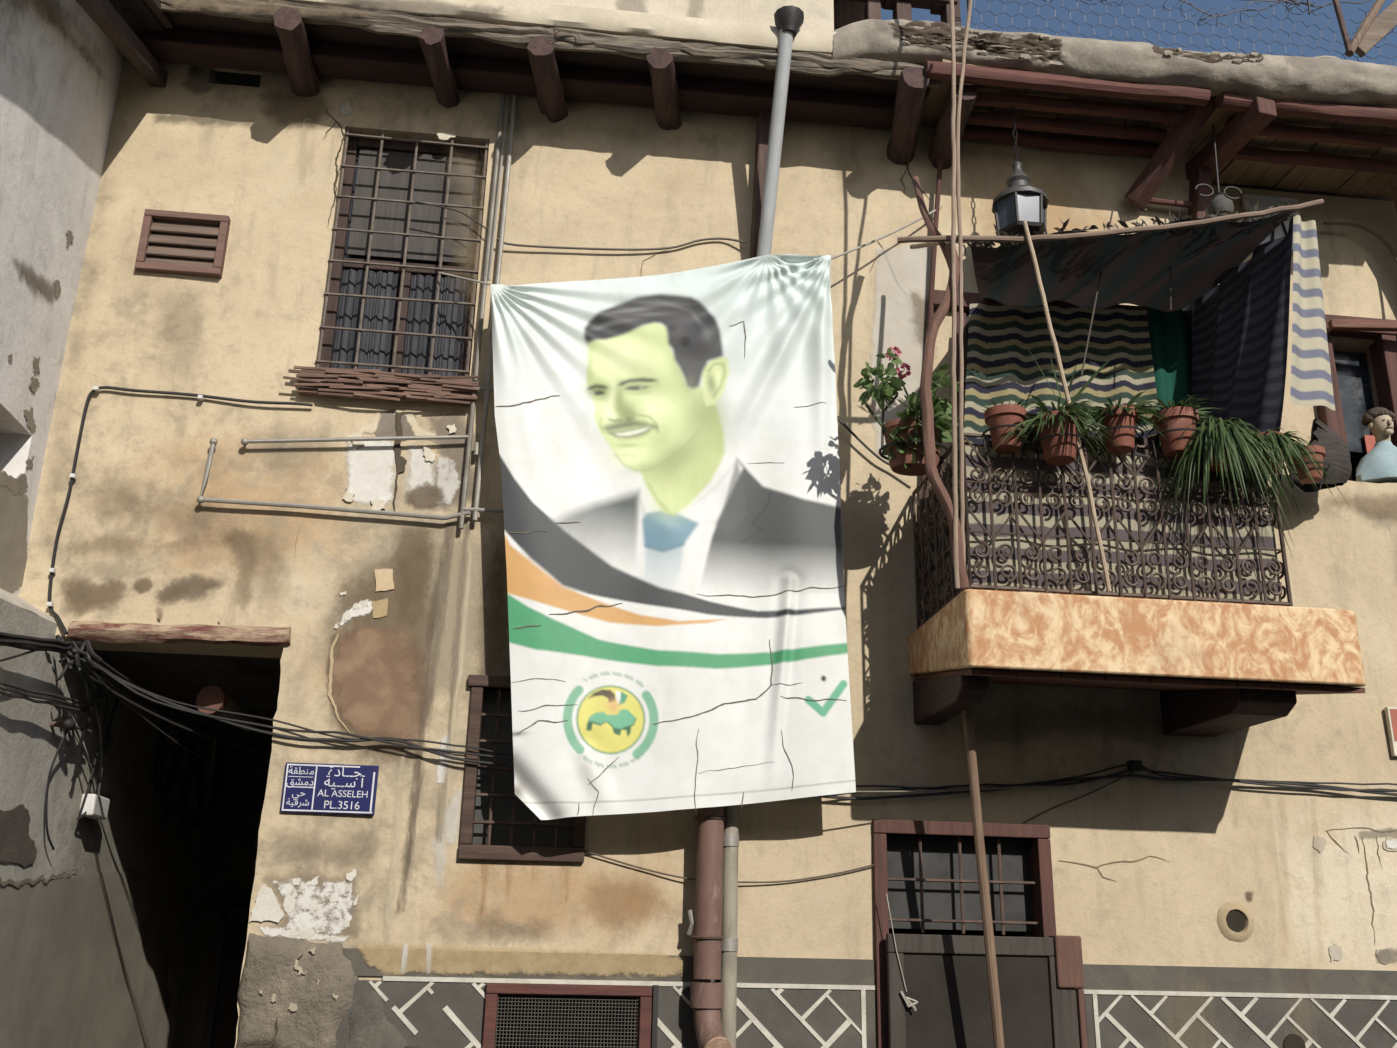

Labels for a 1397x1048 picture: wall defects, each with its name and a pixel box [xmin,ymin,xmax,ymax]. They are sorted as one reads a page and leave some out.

spalling [890,21,1062,61]
peeling [53,279,61,298]
peeling [24,356,40,431]
flaking render [0,455,34,495]
flaking render [342,408,475,510]
damp [65,575,217,619]
flaking render [0,804,37,867]
crack [1059,856,1169,882]
flaking render [236,869,685,1048]